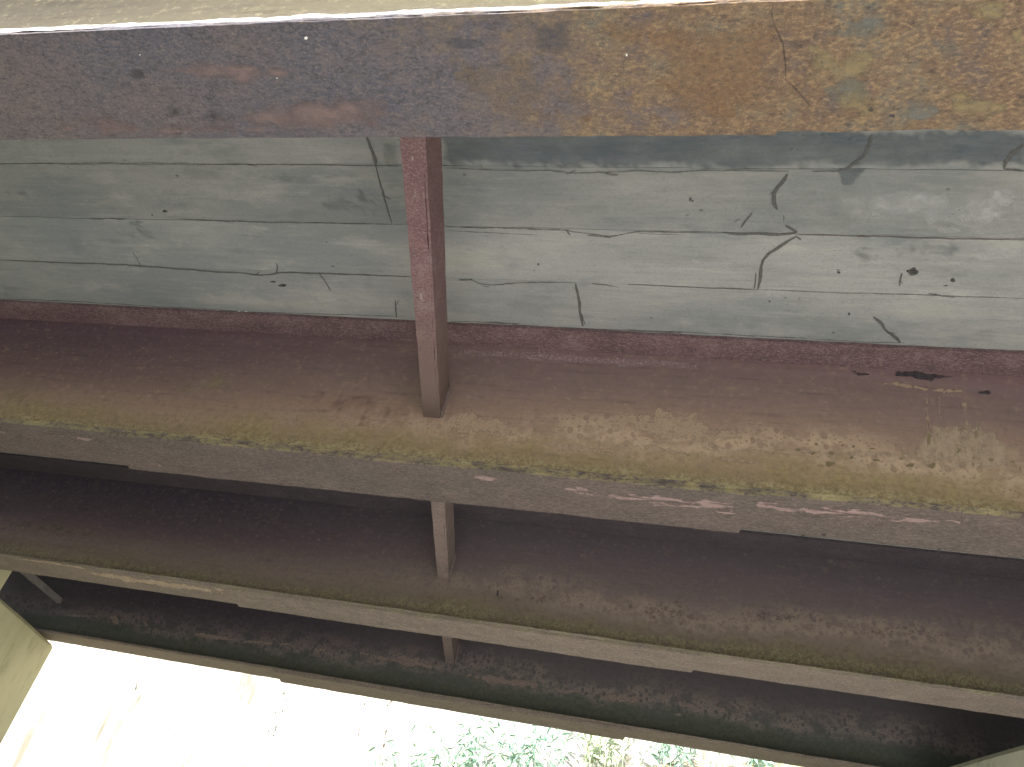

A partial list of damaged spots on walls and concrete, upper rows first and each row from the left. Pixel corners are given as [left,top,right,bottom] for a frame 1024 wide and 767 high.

crack [772,5,810,106]
crack [30,137,392,223]
crack [185,217,365,225]
crack [455,135,1024,343]
leakage [904,398,1008,469]
peeling [565,486,735,514]
peeling [756,501,960,524]